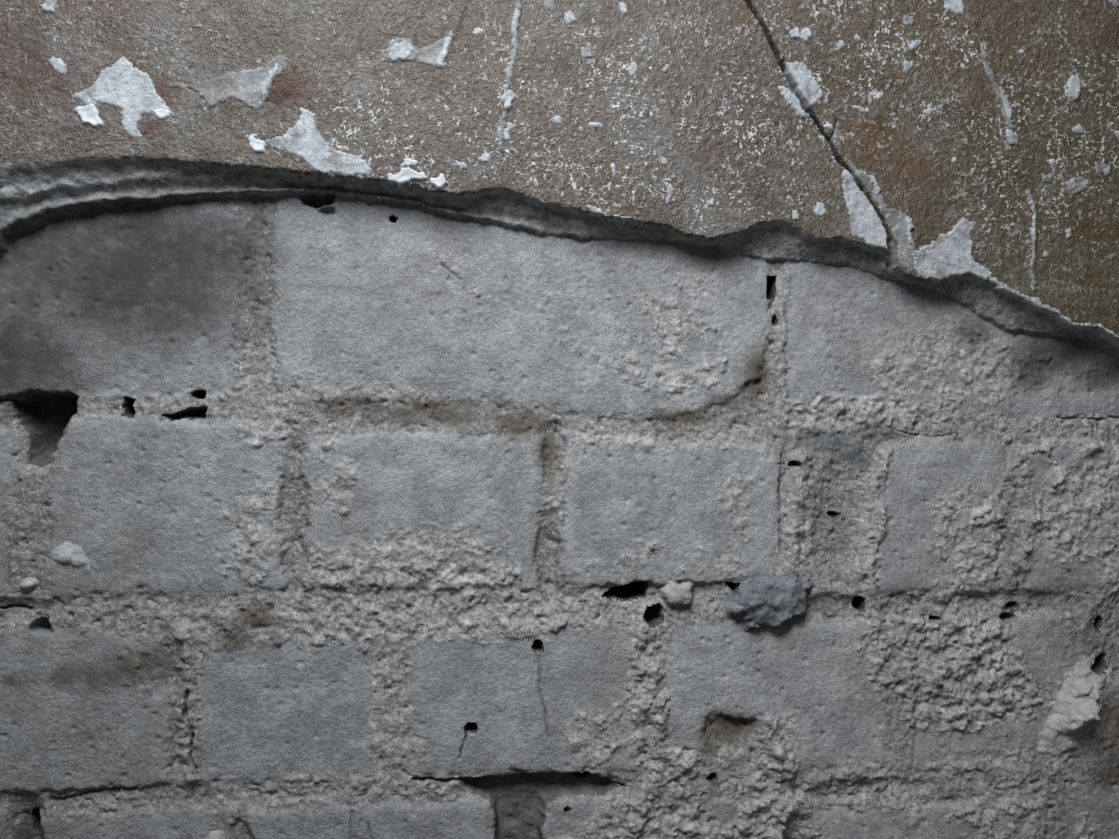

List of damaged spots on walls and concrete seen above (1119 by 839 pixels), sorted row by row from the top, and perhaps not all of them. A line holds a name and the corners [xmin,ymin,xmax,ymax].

peeling [72,57,172,139]
peeling [170,55,290,111]
peeling [380,30,452,69]
peeling [778,61,823,119]
peeling [246,134,267,153]
peeling [266,108,372,176]
peeling [388,158,428,188]
crack [744,0,898,270]
peeling [842,160,918,273]
peeling [914,217,992,284]
damp [0,214,233,389]
spalling [559,607,579,620]